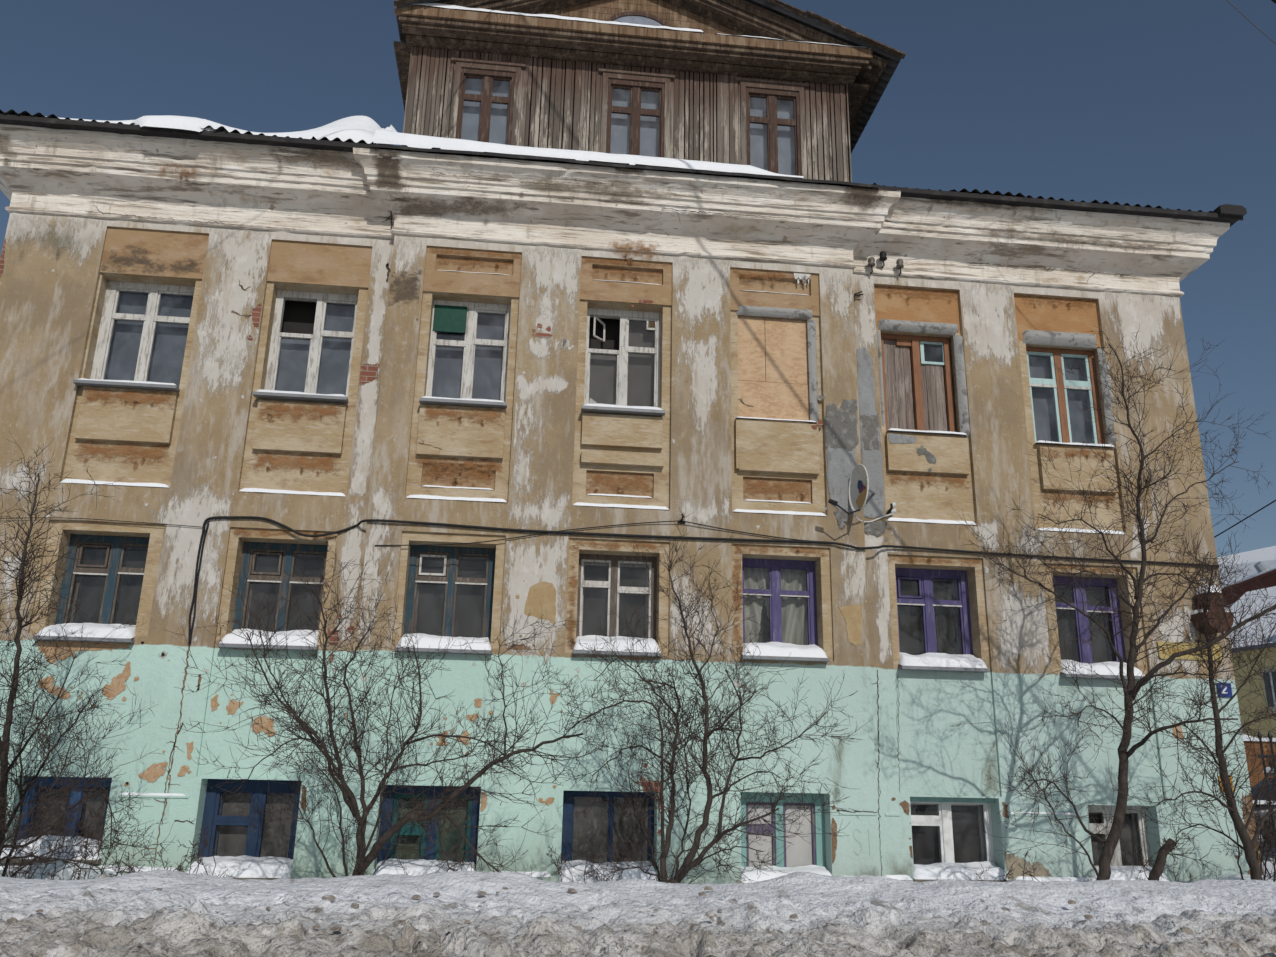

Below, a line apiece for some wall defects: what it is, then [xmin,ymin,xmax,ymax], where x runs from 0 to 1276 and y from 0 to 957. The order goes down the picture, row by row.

spalling [375,149,404,189]
peeling [0,214,106,276]
spalling [102,246,197,272]
peeling [192,228,271,402]
peeling [662,256,734,444]
peeling [1105,291,1181,375]
peeling [327,236,421,672]
peeling [497,247,581,664]
peeling [145,484,234,642]
peeling [839,525,899,664]
peeling [430,698,493,753]